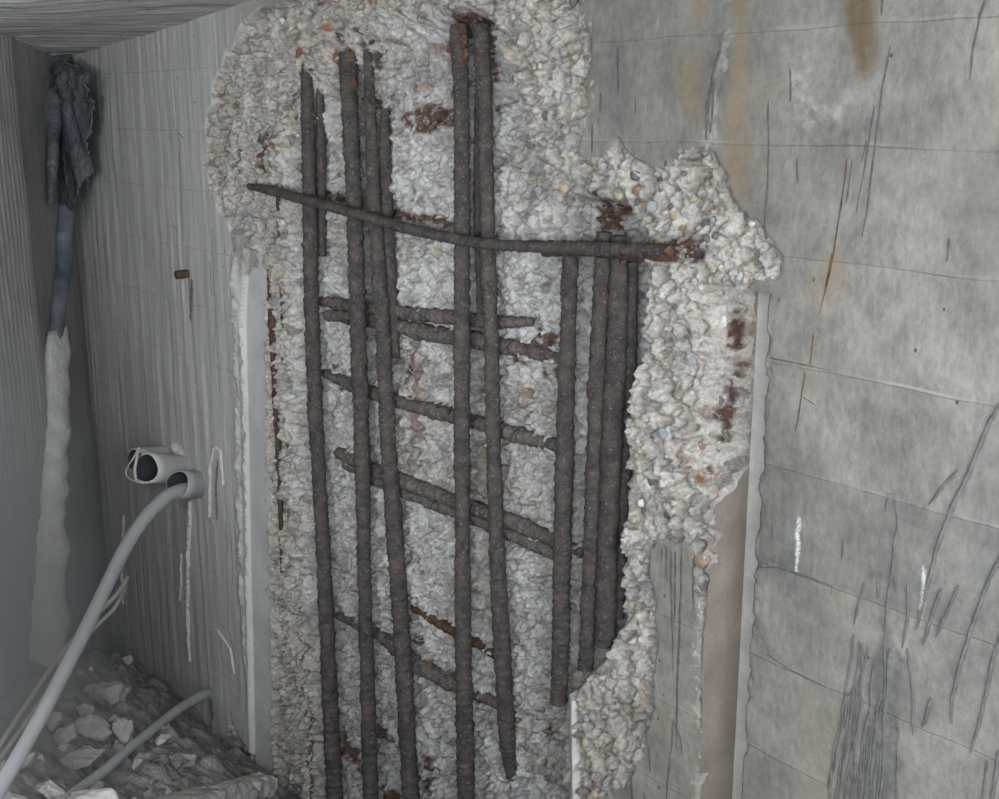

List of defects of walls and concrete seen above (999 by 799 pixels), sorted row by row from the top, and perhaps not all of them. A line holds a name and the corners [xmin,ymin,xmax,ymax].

corrosion [284,19,387,127]
corrosion [375,78,454,155]
corrosion [439,8,506,116]
corrosion [393,206,454,230]
corrosion [588,187,638,235]
crack [764,99,772,247]
crack [767,47,890,431]
corrosion [398,336,431,481]
spalling [203,0,783,799]
corrosion [506,324,560,419]
corrosion [690,305,755,485]
corrosion [417,742,446,799]